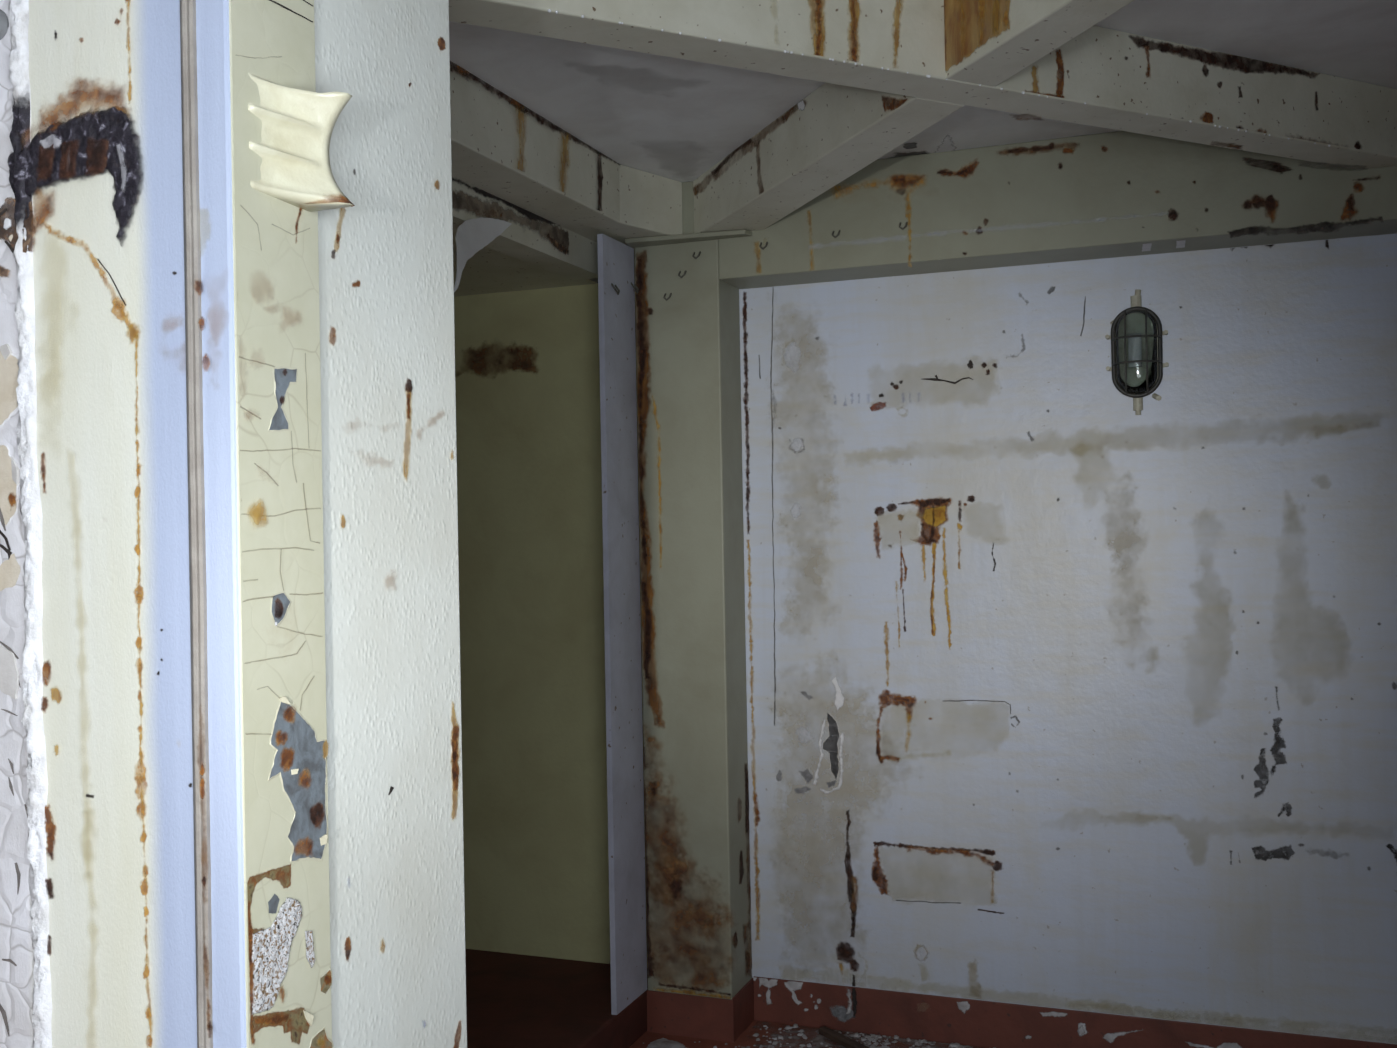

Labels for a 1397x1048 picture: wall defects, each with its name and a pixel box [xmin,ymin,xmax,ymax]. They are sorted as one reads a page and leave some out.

corrosion [944,0,1010,71]
corrosion [35,67,139,342]
peeling [268,366,298,432]
crack [0,530,20,591]
corrosion [635,251,760,999]
corrosion [874,496,975,763]
spalling [795,676,844,793]
crack [8,777,28,817]
crack [14,863,22,895]
peeling [247,695,334,1048]
corrosion [872,841,1002,904]
crack [0,1004,9,1036]